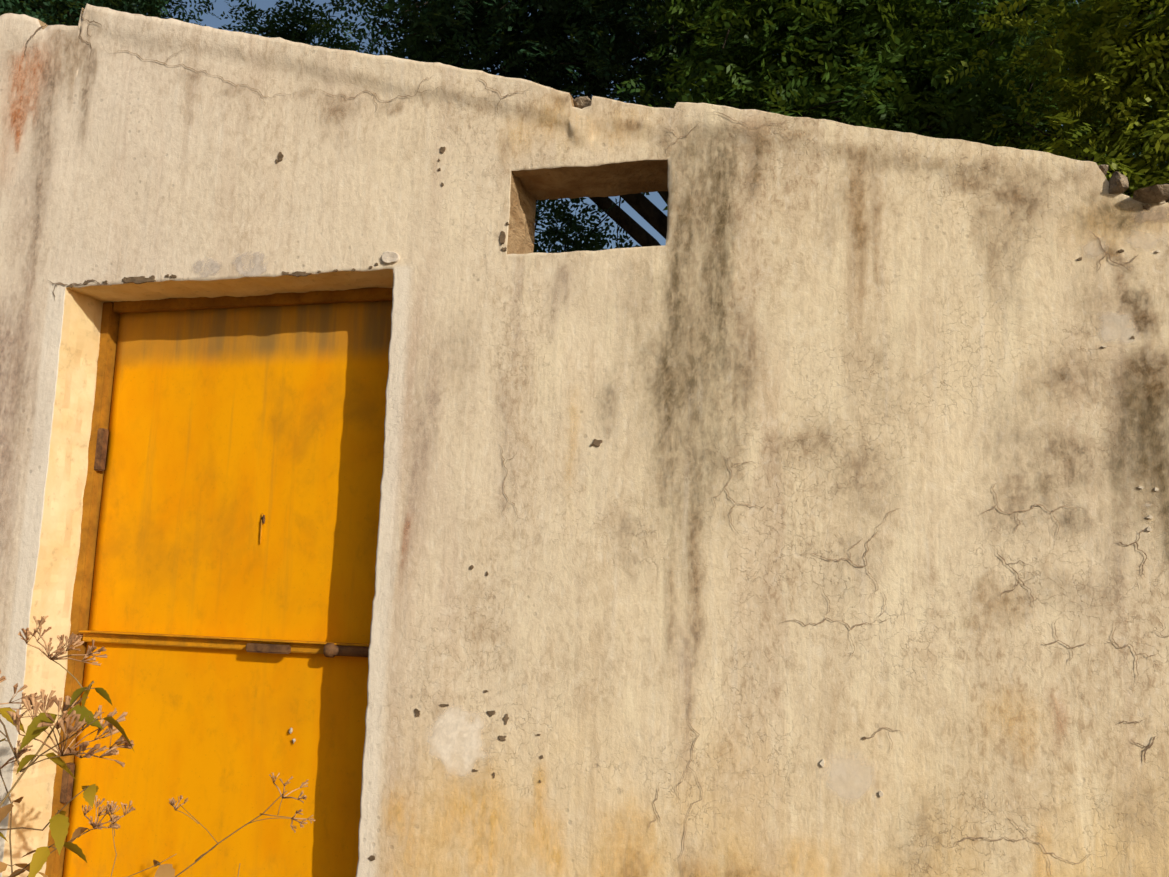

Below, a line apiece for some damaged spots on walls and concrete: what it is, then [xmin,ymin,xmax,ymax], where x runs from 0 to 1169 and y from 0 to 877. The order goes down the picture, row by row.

rust [12,55,42,139]
water stain [1125,357,1168,492]
crack [980,483,1083,533]
crack [1114,529,1149,575]
crack [779,508,899,656]
crack [997,553,1169,688]
crack [866,727,906,752]
crack [1119,720,1156,764]
crack [936,819,1104,876]